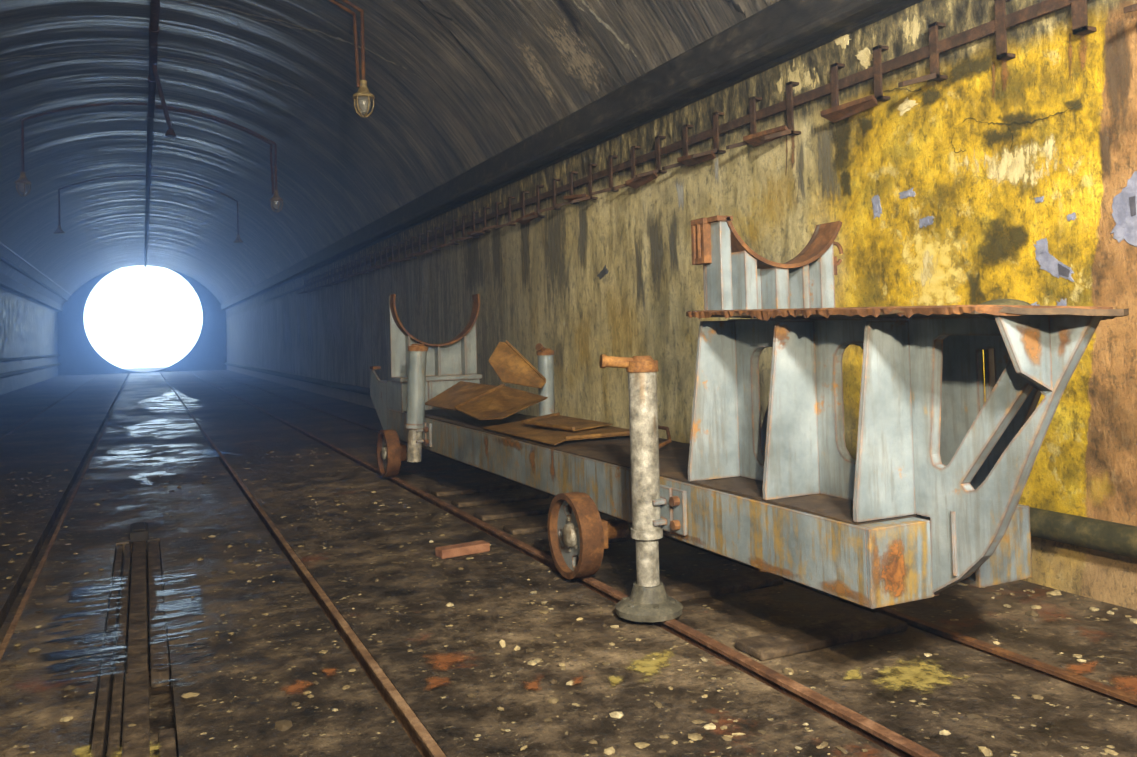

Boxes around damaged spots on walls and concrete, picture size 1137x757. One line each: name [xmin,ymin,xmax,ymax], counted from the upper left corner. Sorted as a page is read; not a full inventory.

damp [923,53,1001,105]
damp [983,112,1037,149]
damp [1065,100,1083,110]
corrosion [1069,34,1087,76]
damp [798,117,873,199]
peeling [1110,171,1137,247]
damp [543,199,588,303]
damp [635,184,683,306]
damp [967,219,1029,304]
peeling [1034,238,1075,282]
corrosion [1018,328,1041,363]
corrosion [1059,328,1068,353]